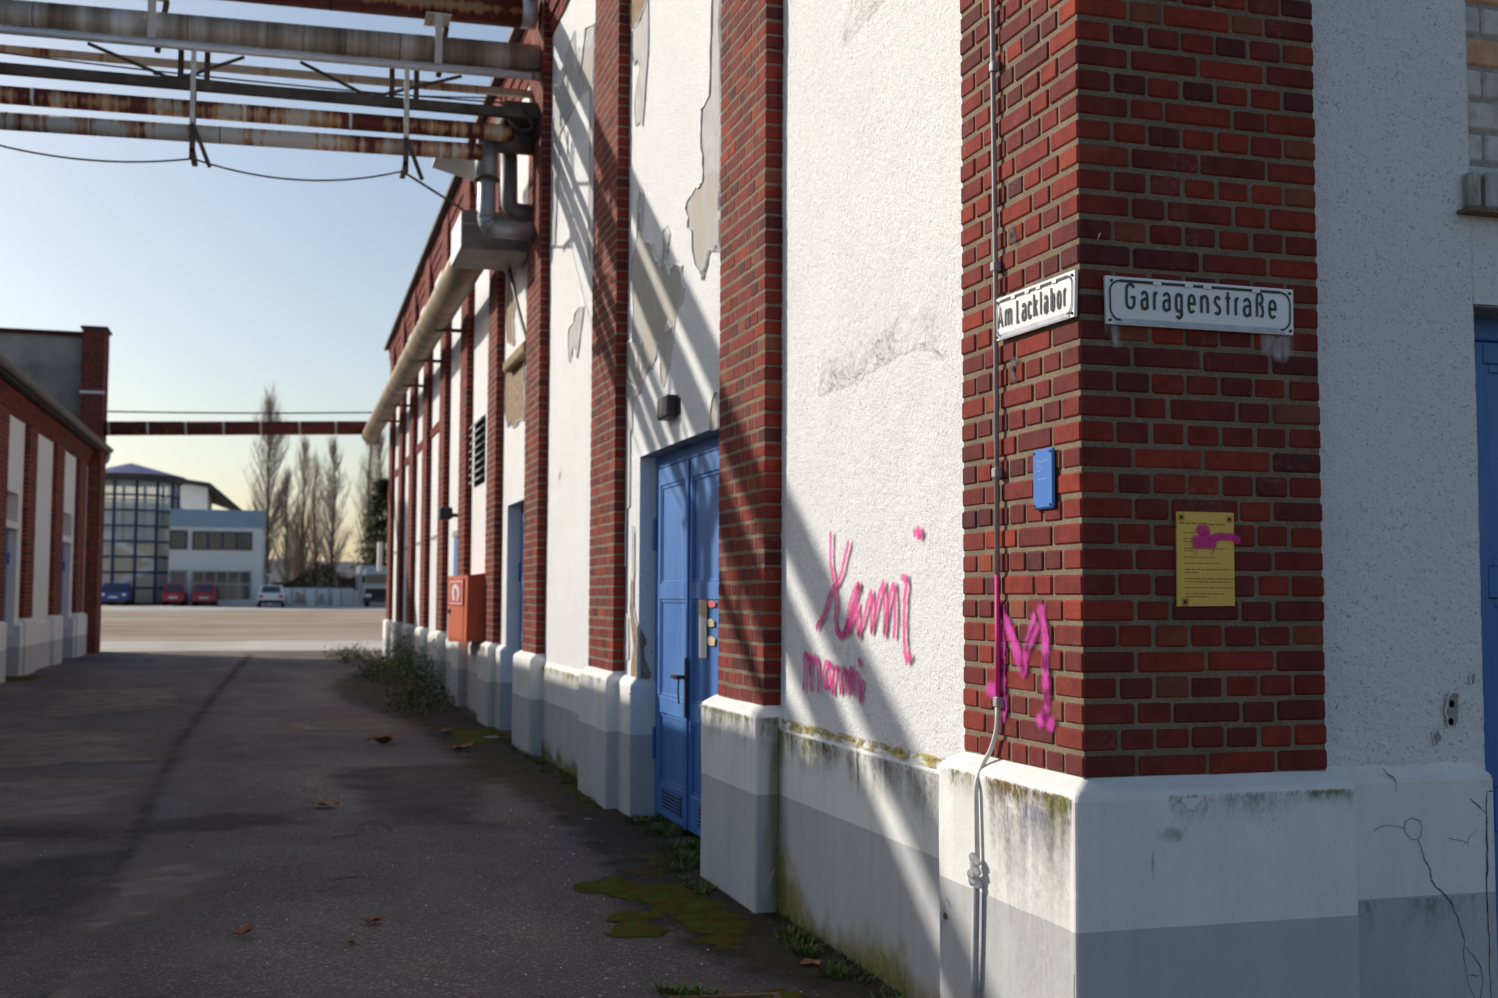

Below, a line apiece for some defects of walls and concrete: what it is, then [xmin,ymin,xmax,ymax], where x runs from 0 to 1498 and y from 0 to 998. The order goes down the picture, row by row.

peeling [551,23,595,272]
peeling [624,0,722,679]
leakage [700,705,919,785]
leakage [951,768,1069,837]
crack [1374,768,1496,998]